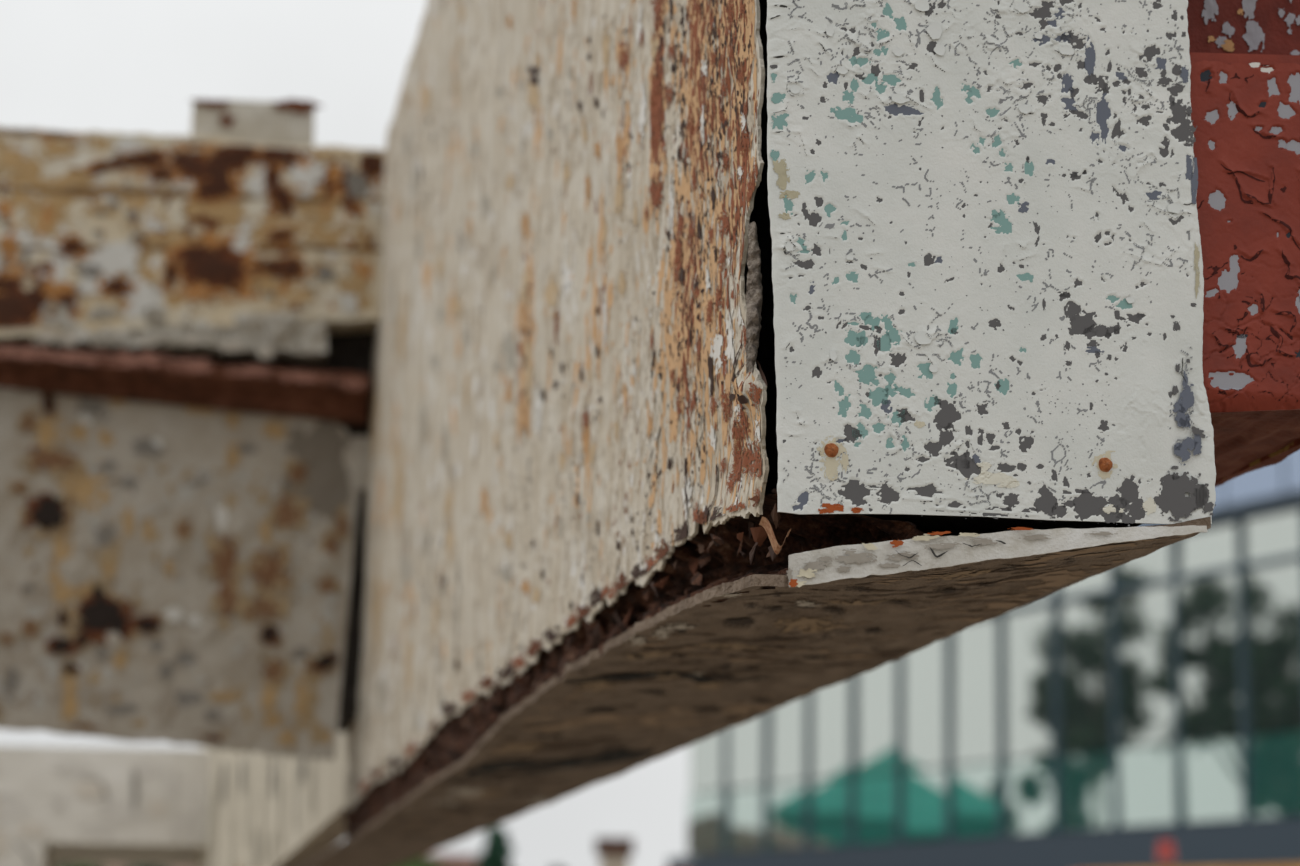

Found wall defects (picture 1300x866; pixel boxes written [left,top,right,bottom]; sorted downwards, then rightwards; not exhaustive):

rust [618,0,758,202]
peeling [826,26,881,90]
peeling [1014,0,1197,158]
rust [83,99,315,304]
rust [55,233,90,260]
rust [0,269,137,329]
rust [0,344,369,390]
crack [707,339,790,407]
peeling [859,325,907,367]
peeling [1058,278,1146,352]
peeling [838,480,963,508]
peeling [916,397,1216,524]